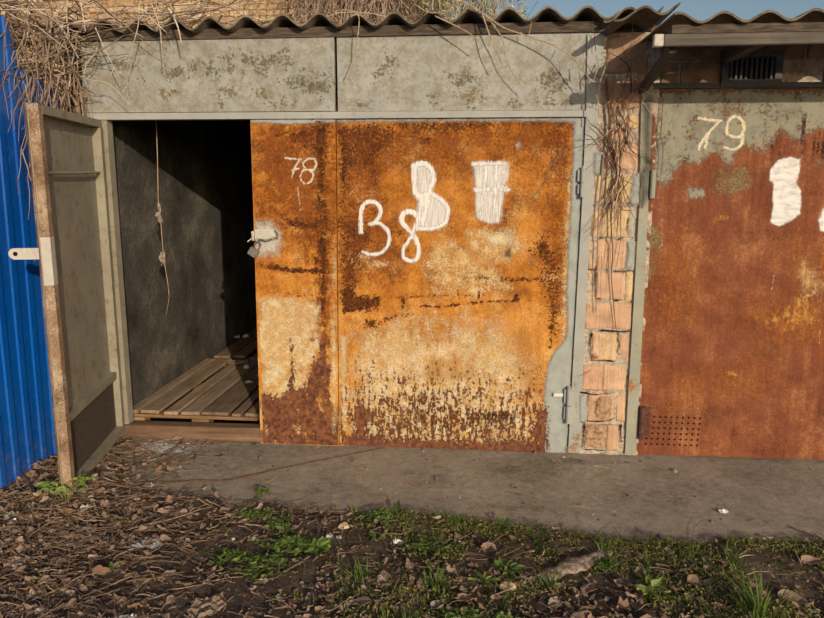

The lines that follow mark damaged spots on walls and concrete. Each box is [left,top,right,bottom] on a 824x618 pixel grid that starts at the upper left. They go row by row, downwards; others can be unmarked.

peeling [653,88,824,196]
rust [798,113,824,166]
peeling [687,187,705,199]
rust [251,111,574,452]
rust [755,258,824,331]